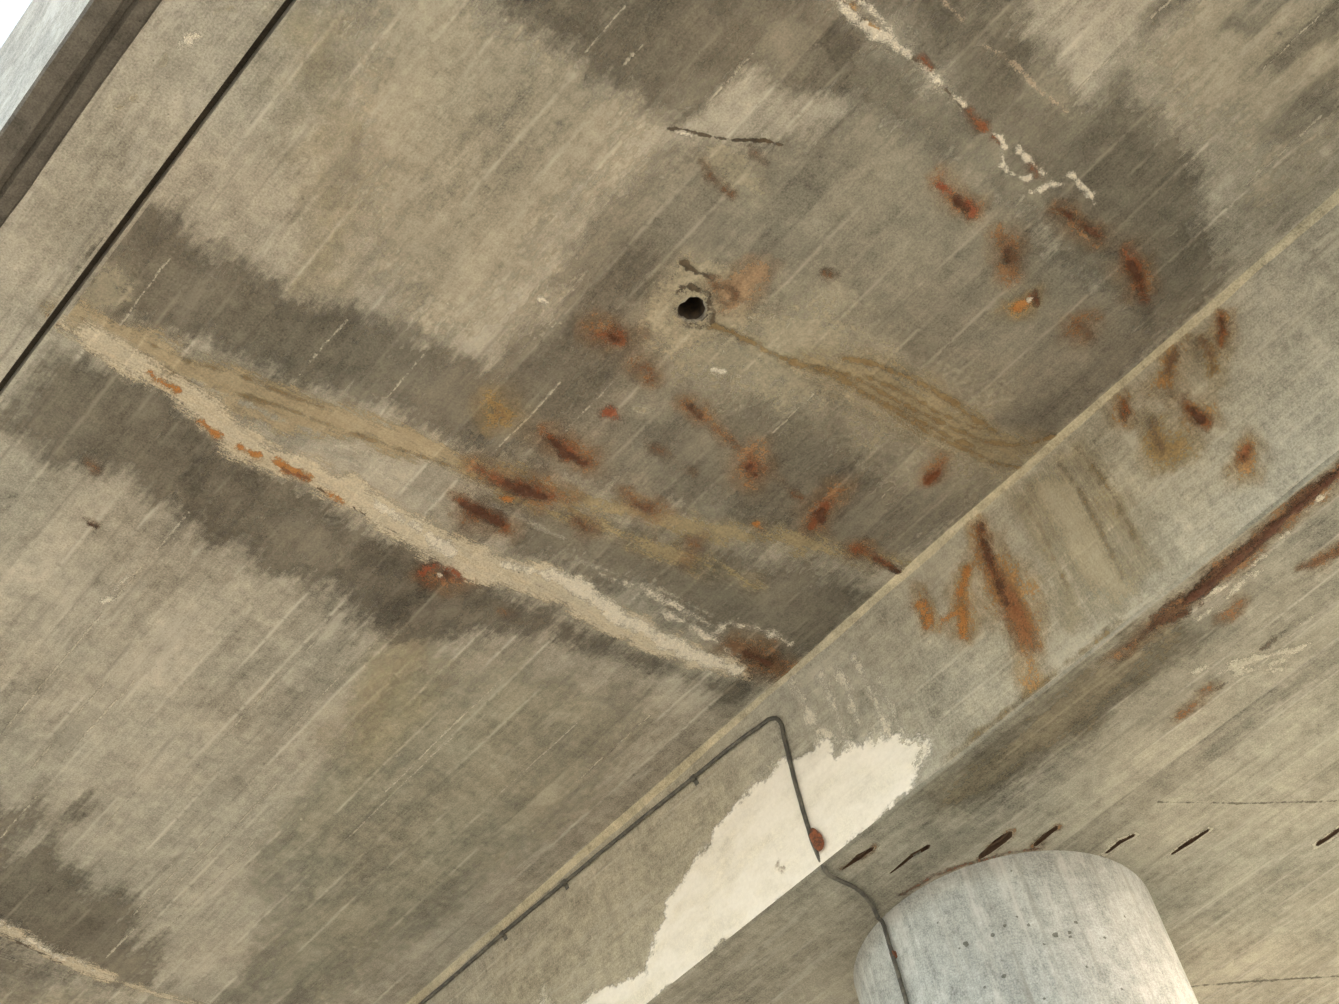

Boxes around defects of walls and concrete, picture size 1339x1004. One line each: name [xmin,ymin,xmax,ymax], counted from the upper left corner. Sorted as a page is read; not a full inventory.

crack [667,127,784,146]
crack [837,0,1095,205]
rust [926,165,1044,320]
crack [40,266,911,681]
rust [447,422,603,538]
water stain [0,0,1230,811]
rust [1107,310,1234,473]
rust [914,515,1045,694]
water stain [0,792,161,994]
crack [0,919,202,1004]
spalling [840,845,877,870]
spalling [890,845,930,873]